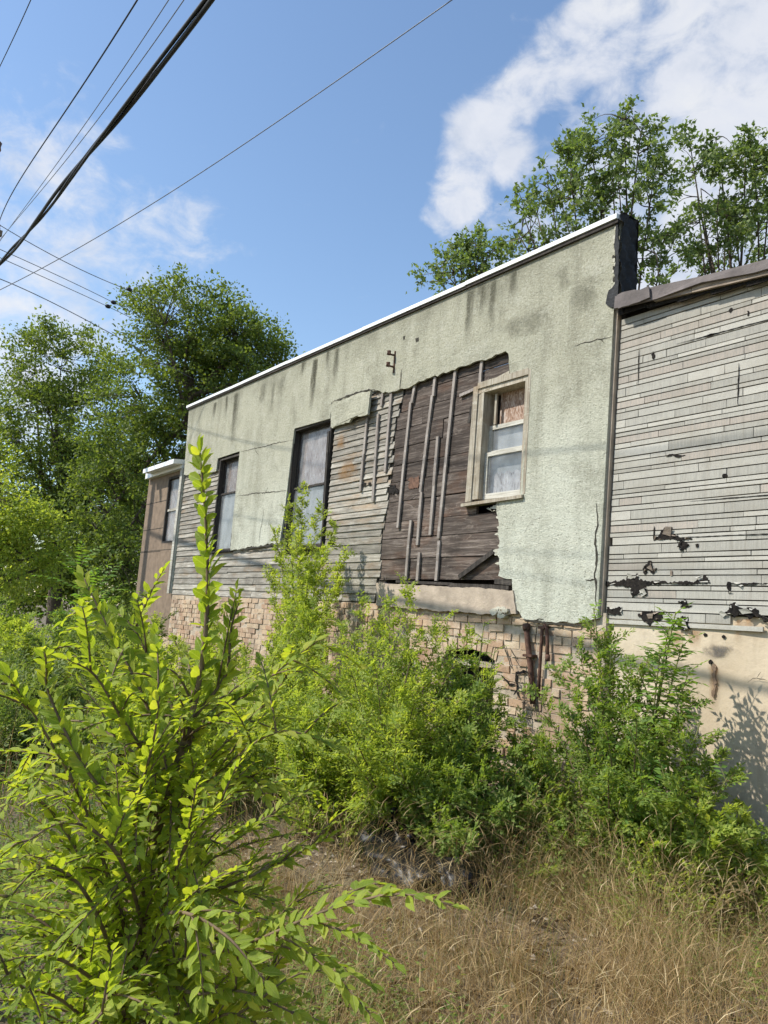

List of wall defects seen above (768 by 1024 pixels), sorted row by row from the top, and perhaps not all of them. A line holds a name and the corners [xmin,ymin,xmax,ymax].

leakage [467,280,496,318]
peeling [654,526,698,551]
peeling [627,562,658,597]
rust [708,659,717,697]